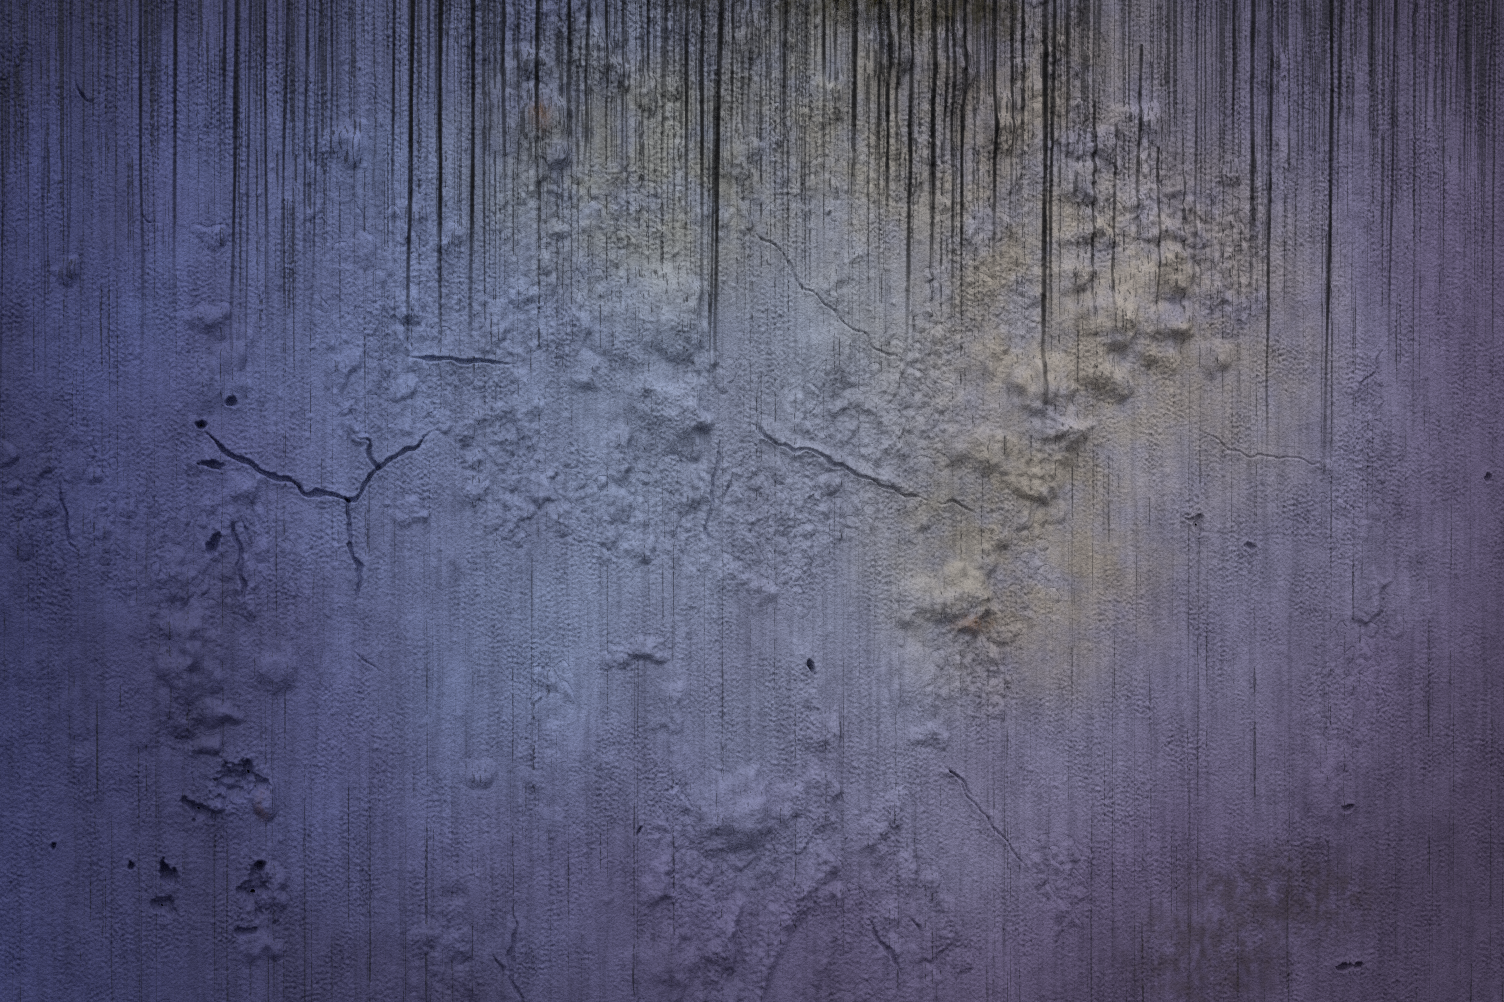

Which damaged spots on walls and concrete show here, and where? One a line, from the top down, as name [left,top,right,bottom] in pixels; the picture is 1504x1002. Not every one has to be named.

peeling [283,0,1286,621]
crack [191,413,449,622]
crack [691,406,991,568]
peeling [909,602,1023,730]
crack [930,739,1045,887]